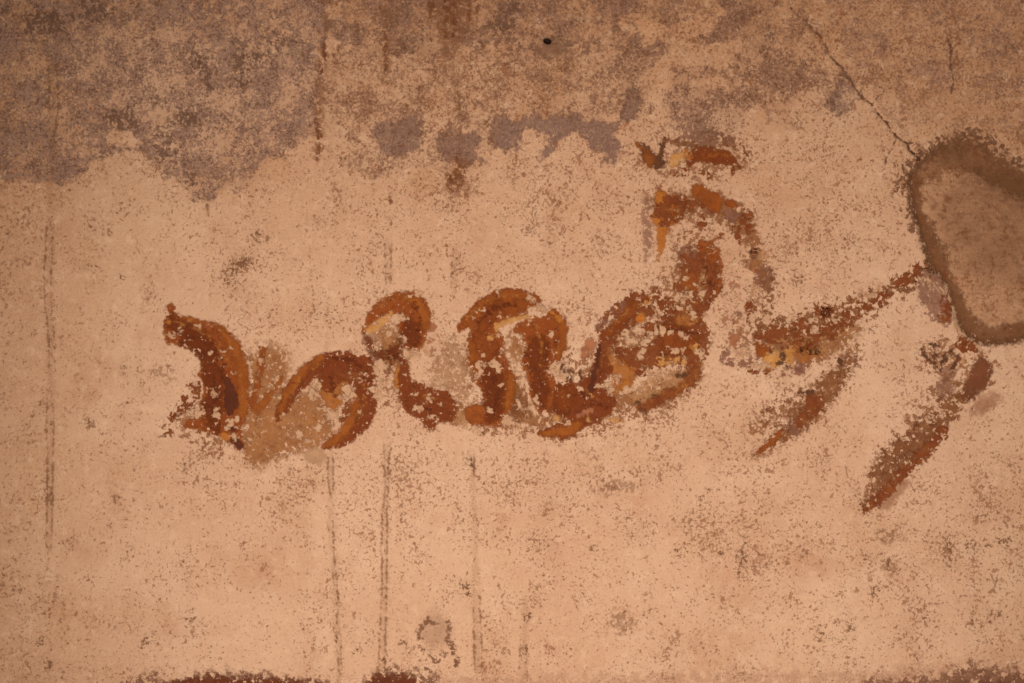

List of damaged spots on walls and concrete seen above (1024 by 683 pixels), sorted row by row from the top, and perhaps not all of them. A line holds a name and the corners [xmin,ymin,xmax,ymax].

damp [108,105,136,131]
crack [790,7,920,164]